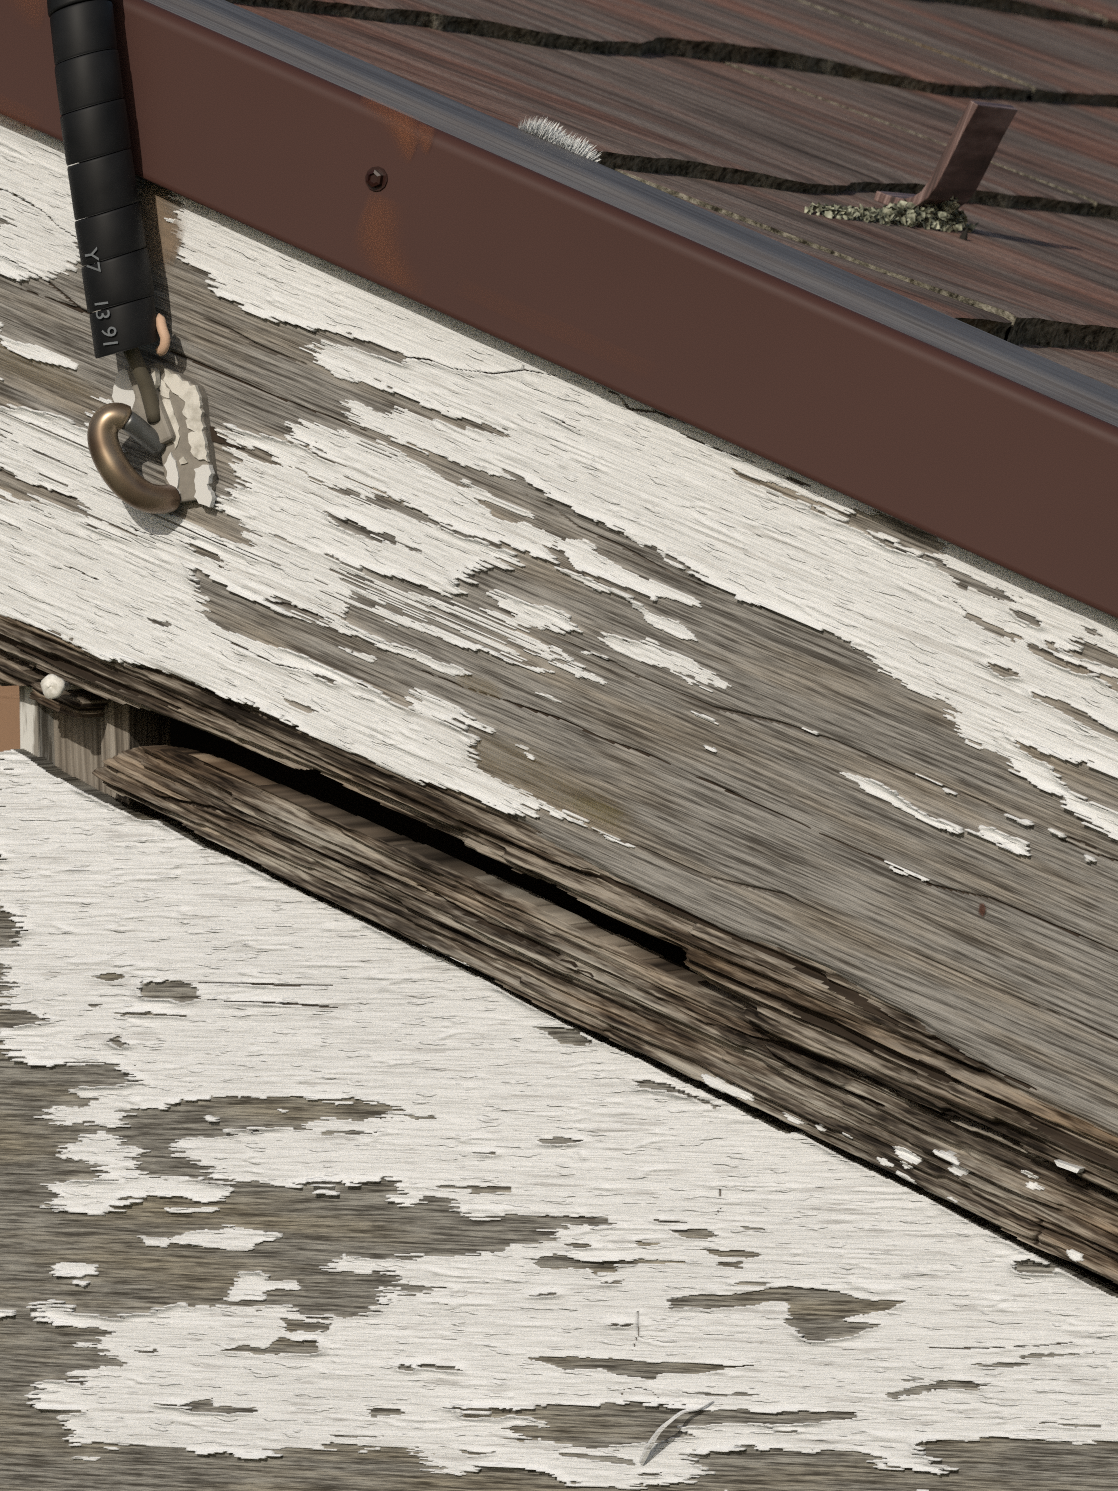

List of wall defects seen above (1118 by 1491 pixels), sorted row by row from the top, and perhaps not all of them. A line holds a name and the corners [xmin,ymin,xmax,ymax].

crack [271,601,347,627]
peeling [0,175,1118,1139]
crack [156,795,350,867]
crack [422,635,1118,952]
crack [417,885,594,978]
crack [197,982,338,1008]
peeling [0,906,1118,1491]